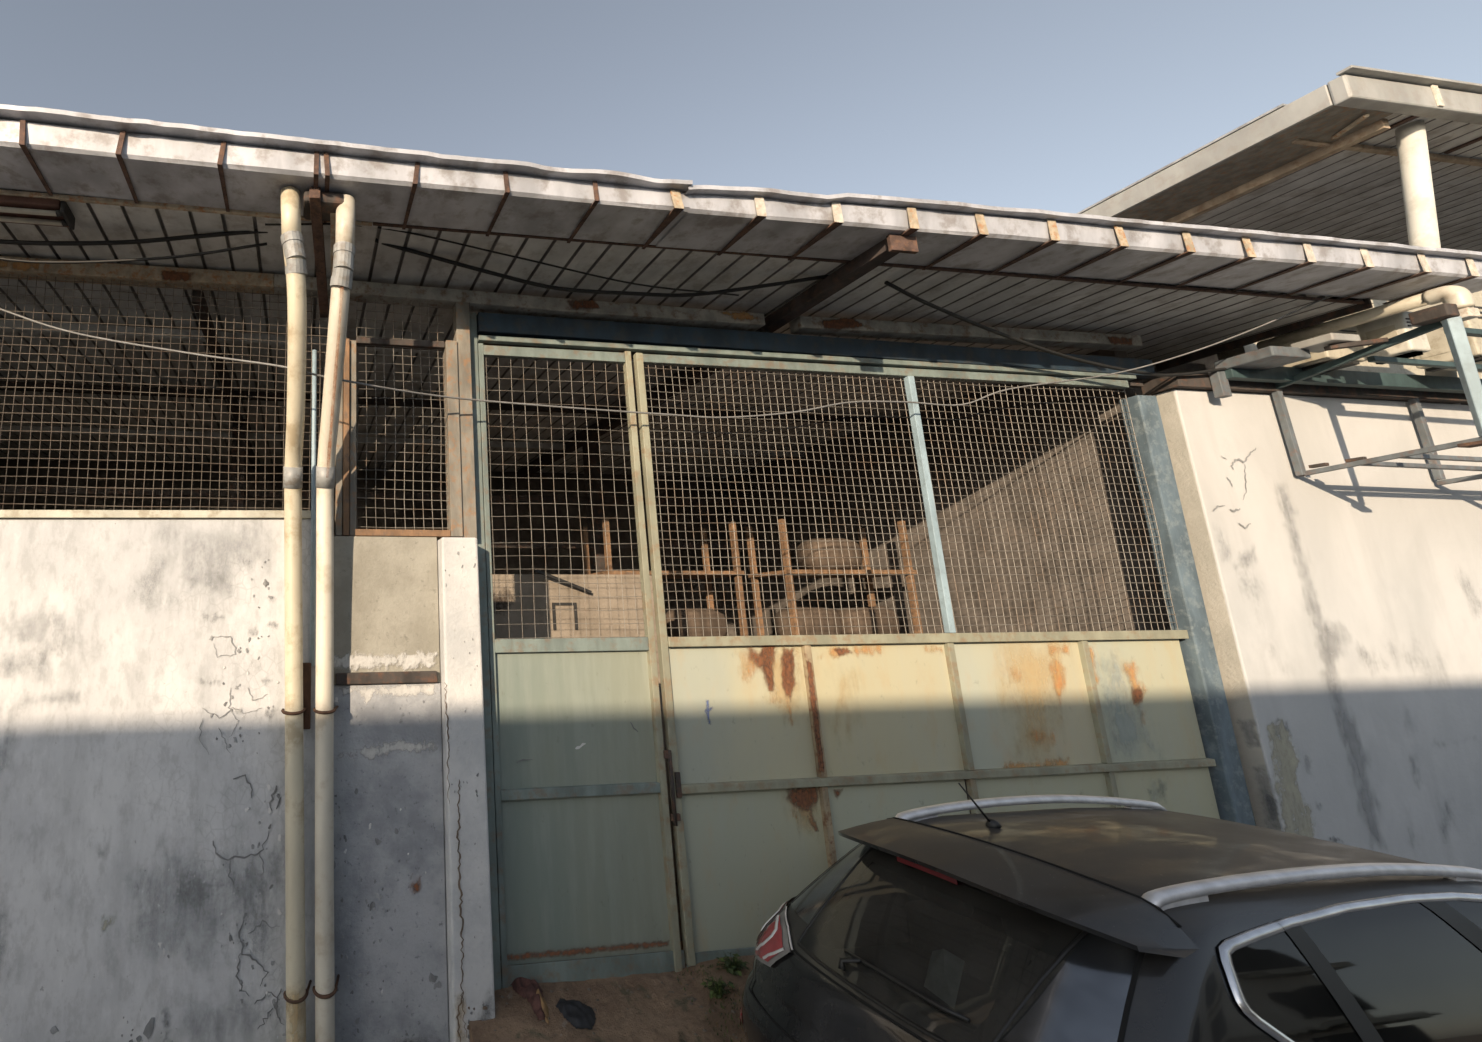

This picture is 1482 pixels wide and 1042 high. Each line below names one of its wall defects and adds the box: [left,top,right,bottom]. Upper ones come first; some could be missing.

crack [1213,448,1256,529]
crack [213,774,286,1039]
peeling [334,651,437,707]
crack [444,685,467,1042]
corrosion [748,645,840,831]
peeling [1265,720,1337,842]